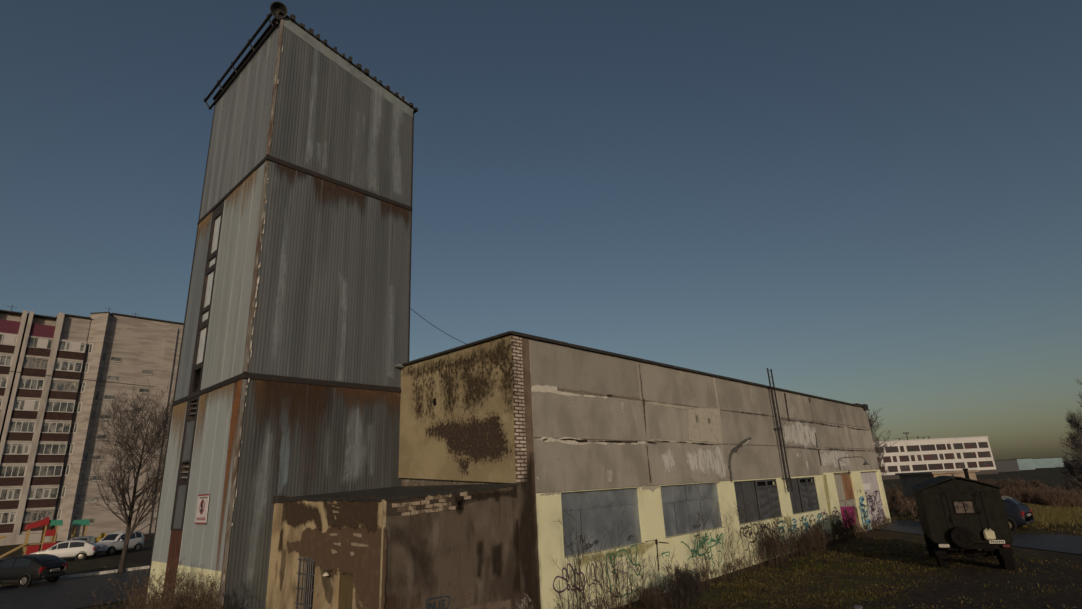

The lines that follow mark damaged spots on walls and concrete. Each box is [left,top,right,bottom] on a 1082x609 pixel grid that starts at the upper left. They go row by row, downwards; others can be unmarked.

leakage [387,338,515,419]
corrosion [172,379,243,557]
flaking render [425,411,512,476]
flaking render [287,488,497,609]